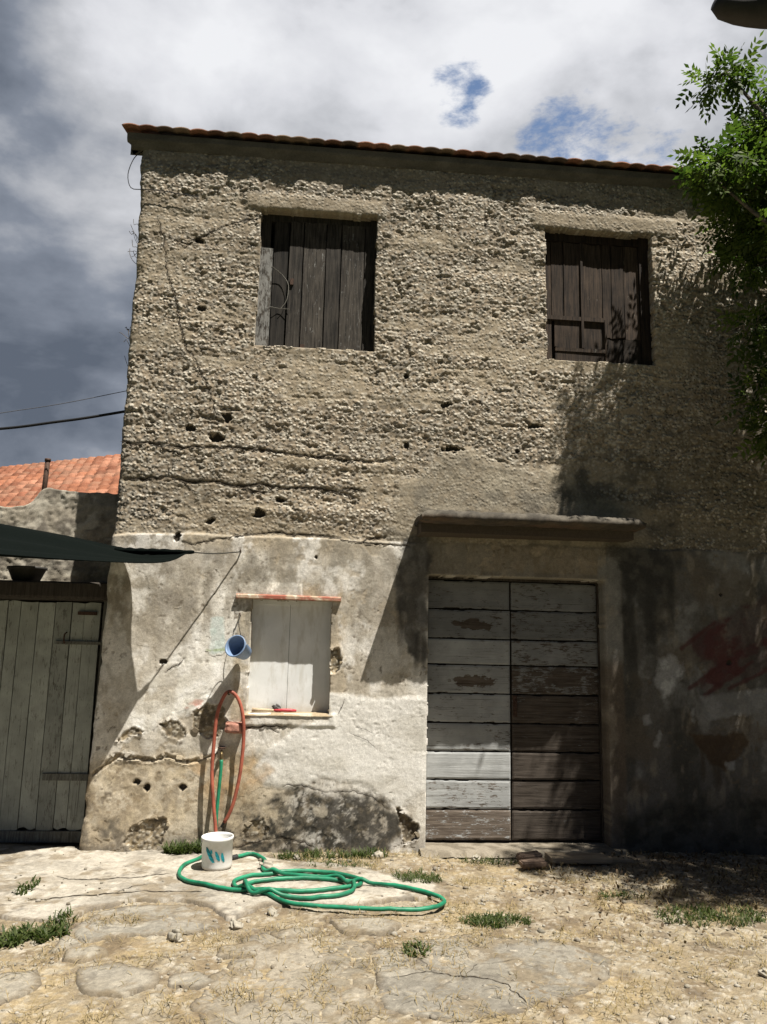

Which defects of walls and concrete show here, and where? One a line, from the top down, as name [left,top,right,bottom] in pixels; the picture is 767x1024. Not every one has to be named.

crack [121,441,393,500]
spalling [330,647,343,675]
peeling [92,625,228,777]
water stain [80,815,131,852]
spalling [123,815,170,851]
water stain [158,780,421,854]
spalling [396,807,420,845]